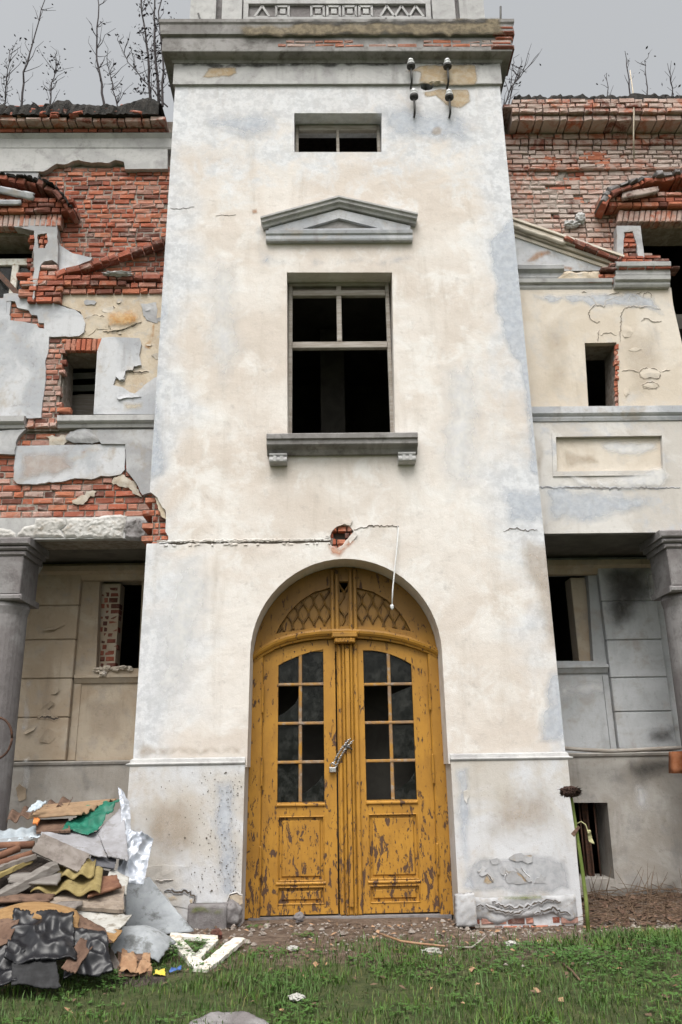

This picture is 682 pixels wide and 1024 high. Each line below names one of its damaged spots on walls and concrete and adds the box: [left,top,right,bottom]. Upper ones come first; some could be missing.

spalling [409,65,477,107]
flaking render [508,152,673,251]
flaking render [0,167,170,335]
crack [582,291,662,342]
water stain [492,222,538,472]
crack [622,367,670,390]
flaking render [0,303,168,546]
crack [157,524,399,547]
spalling [326,520,357,548]
crack [503,525,537,533]
peeling [479,853,546,884]
flaking render [469,917,578,928]